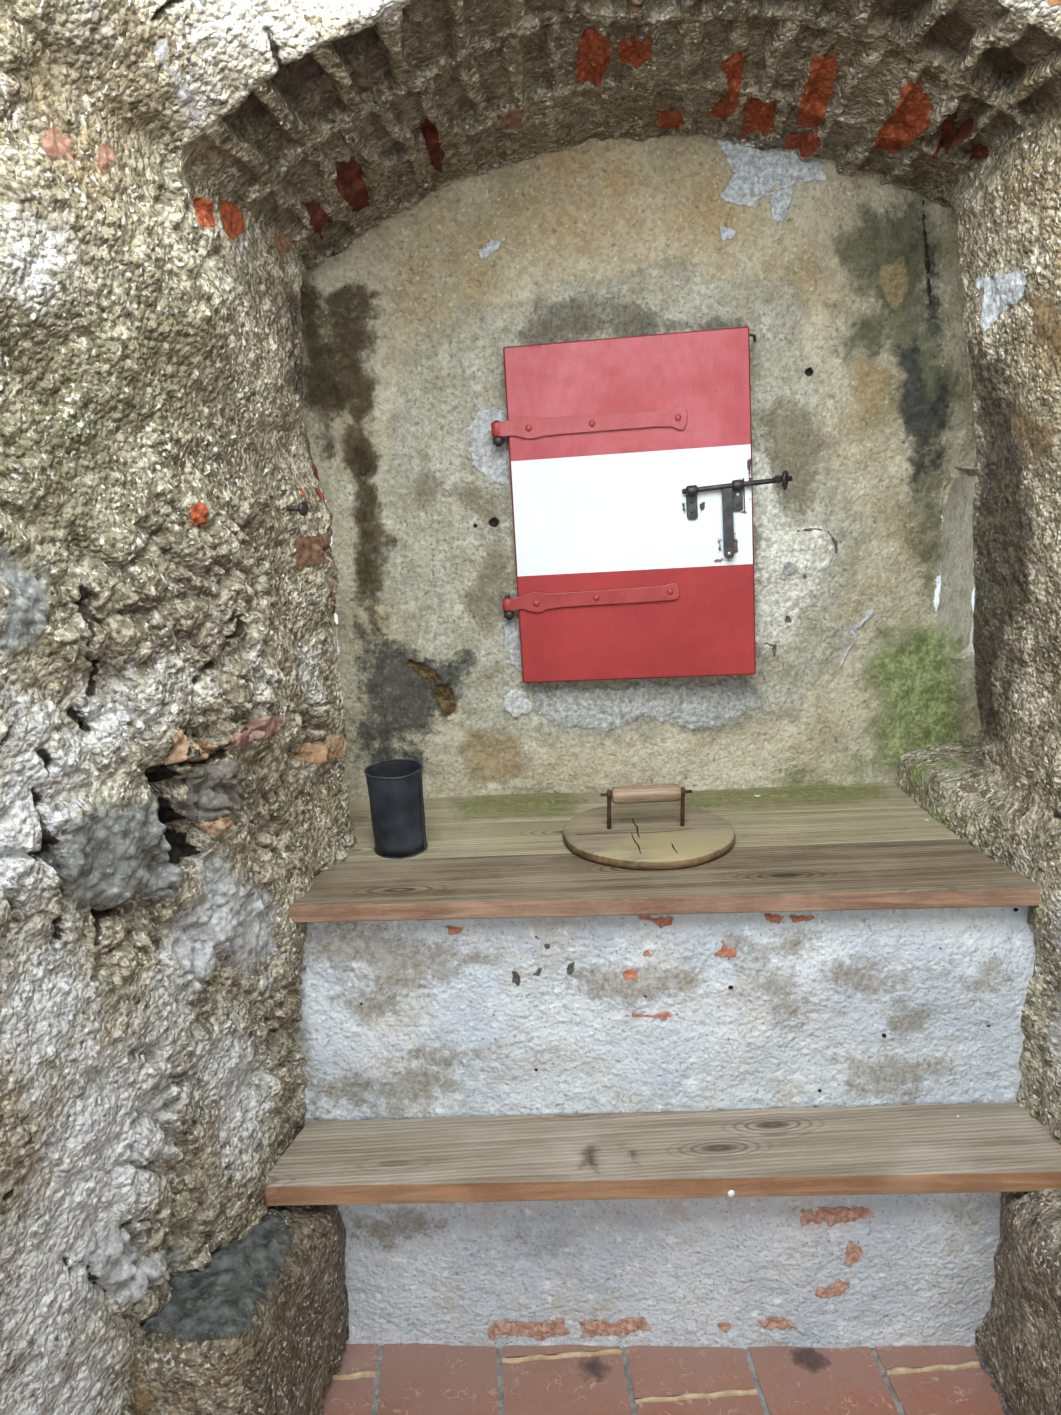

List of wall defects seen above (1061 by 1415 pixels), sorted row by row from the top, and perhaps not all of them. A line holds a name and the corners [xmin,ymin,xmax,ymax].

flaking render [576,28,652,86]
flaking render [421,118,445,173]
peeling [707,52,838,222]
flaking render [869,79,989,161]
flaking render [336,156,371,212]
flaking render [192,197,244,241]
water stain [898,345,949,485]
water stain [290,282,475,764]
flaking render [800,1205,874,1227]
flaking render [815,1241,863,1298]
flaking render [488,1317,651,1341]
flaking render [757,1316,795,1330]